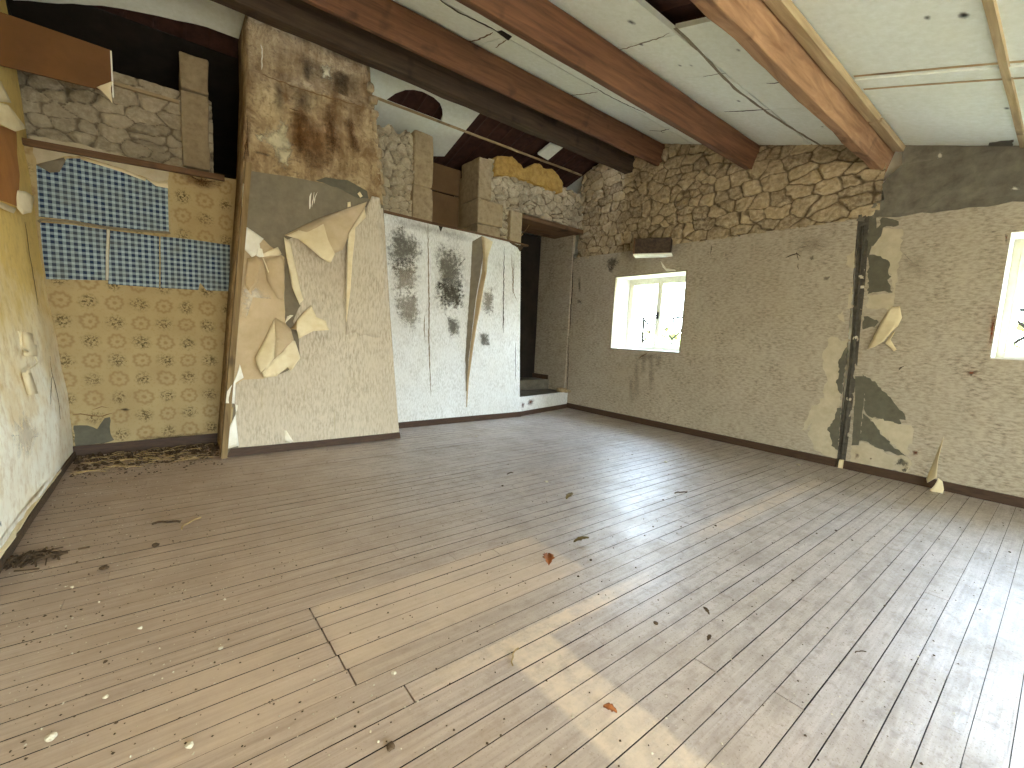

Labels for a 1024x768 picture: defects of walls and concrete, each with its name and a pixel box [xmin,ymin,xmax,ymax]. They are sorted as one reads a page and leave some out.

water stain [294,113,336,159]
water stain [348,122,356,149]
peeling [316,177,368,207]
peeling [287,224,335,263]
peeling [245,247,301,323]
water stain [387,227,422,327]
water stain [436,245,464,335]
peeling [465,236,483,391]
peeling [801,217,914,473]
flaking render [73,417,114,446]
peeling [930,478,944,493]